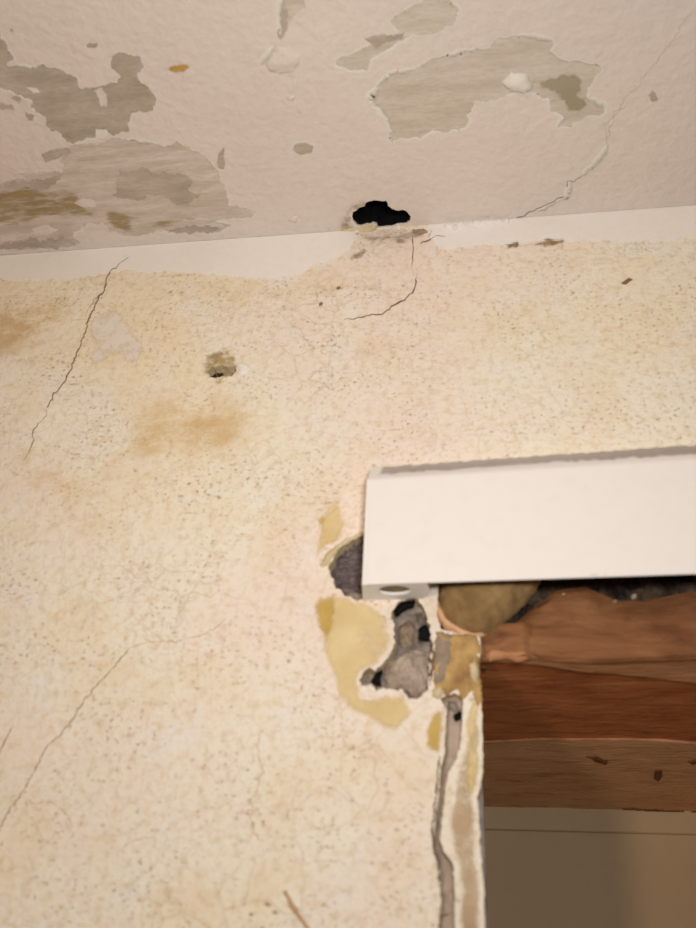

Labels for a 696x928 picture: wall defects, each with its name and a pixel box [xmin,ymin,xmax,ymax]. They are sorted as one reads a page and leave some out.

peeling [0,28,257,251]
peeling [334,0,462,74]
peeling [364,32,608,145]
crack [347,235,444,320]
crack [22,257,129,462]
spalling [206,352,250,378]
flaking render [320,531,364,600]
flaking render [362,599,483,706]
crack [0,618,226,828]